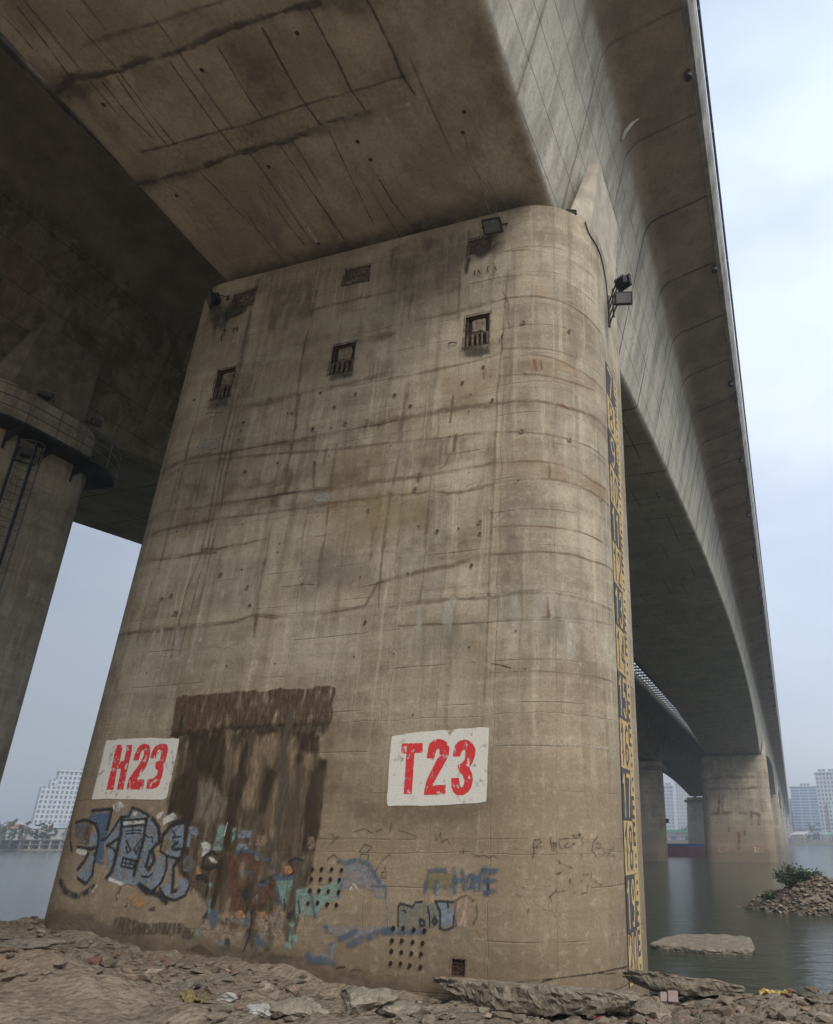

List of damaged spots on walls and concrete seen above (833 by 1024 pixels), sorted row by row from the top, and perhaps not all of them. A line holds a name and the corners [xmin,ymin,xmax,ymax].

damp [55,0,322,95]
damp [130,75,410,230]